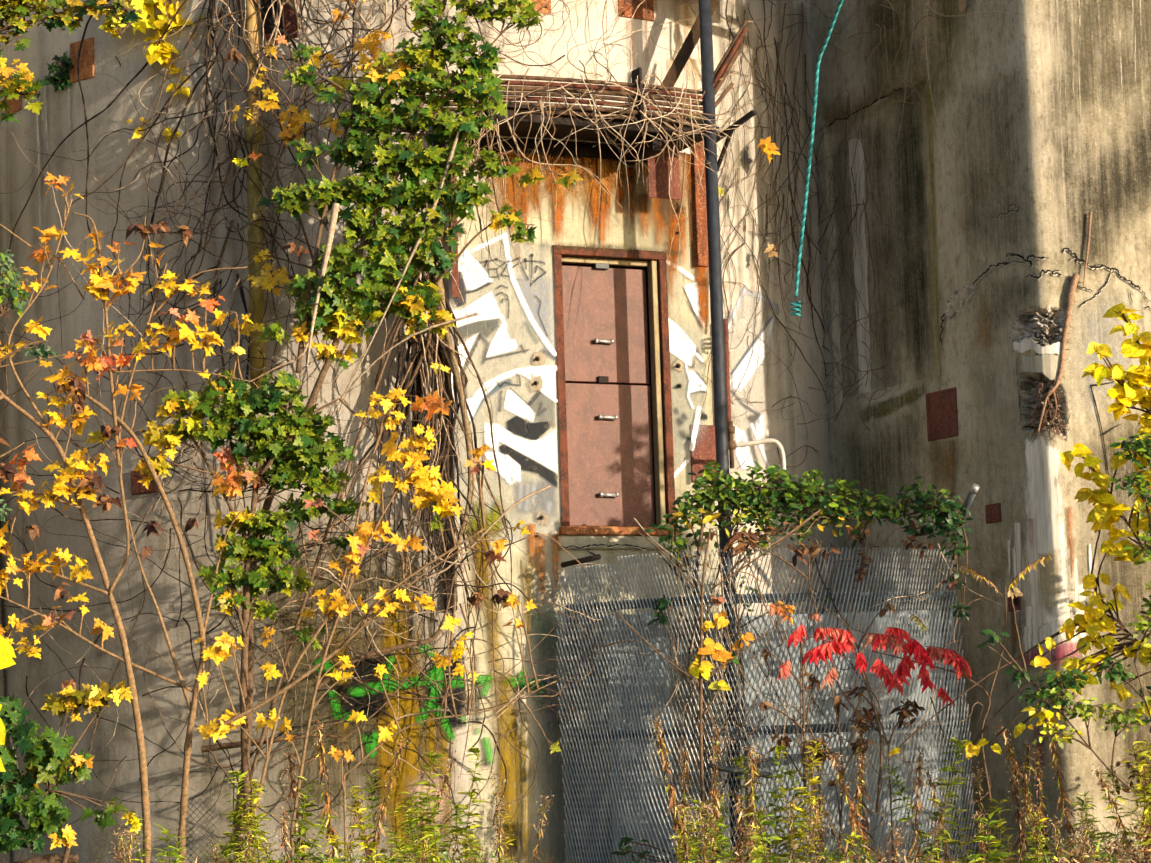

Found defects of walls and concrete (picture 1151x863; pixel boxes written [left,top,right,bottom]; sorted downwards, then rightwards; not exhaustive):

water stain [1048,0,1151,119]
rust [492,152,685,291]
rust [697,266,709,325]
water stain [836,81,939,395]
crack [939,313,947,345]
spalling [1009,305,1070,441]
crack [973,247,1151,310]
water stain [1056,103,1151,266]
rust [528,524,559,593]